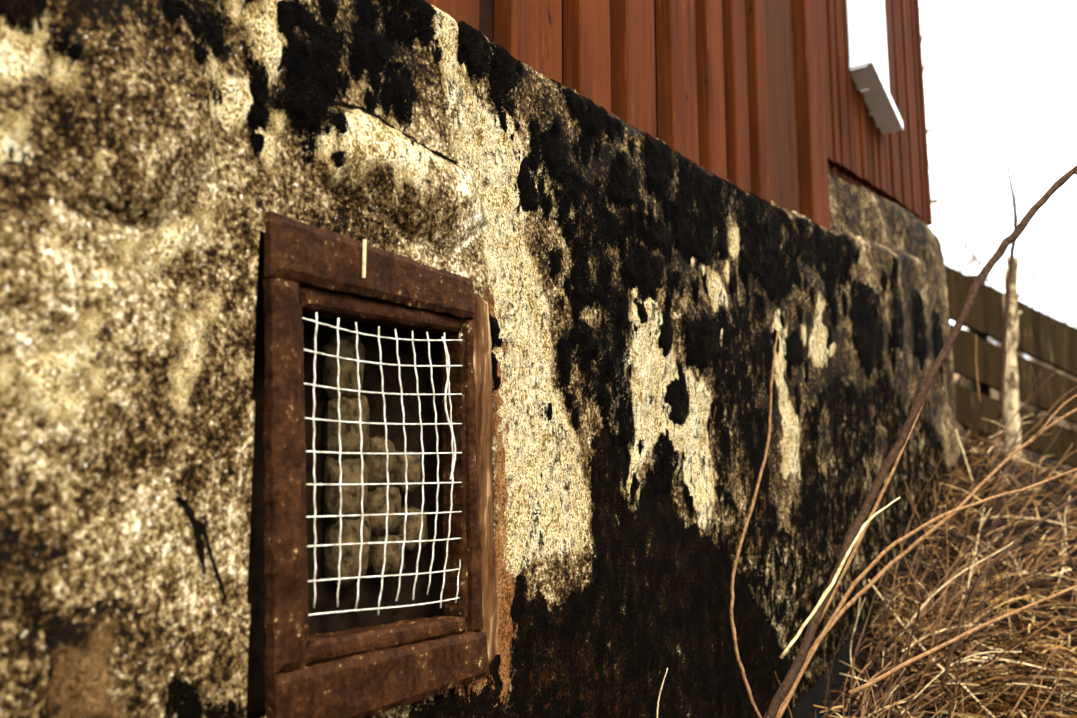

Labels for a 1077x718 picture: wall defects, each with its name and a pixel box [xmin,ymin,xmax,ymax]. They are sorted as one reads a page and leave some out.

leakage [163,668,243,718]
leakage [379,278,953,718]